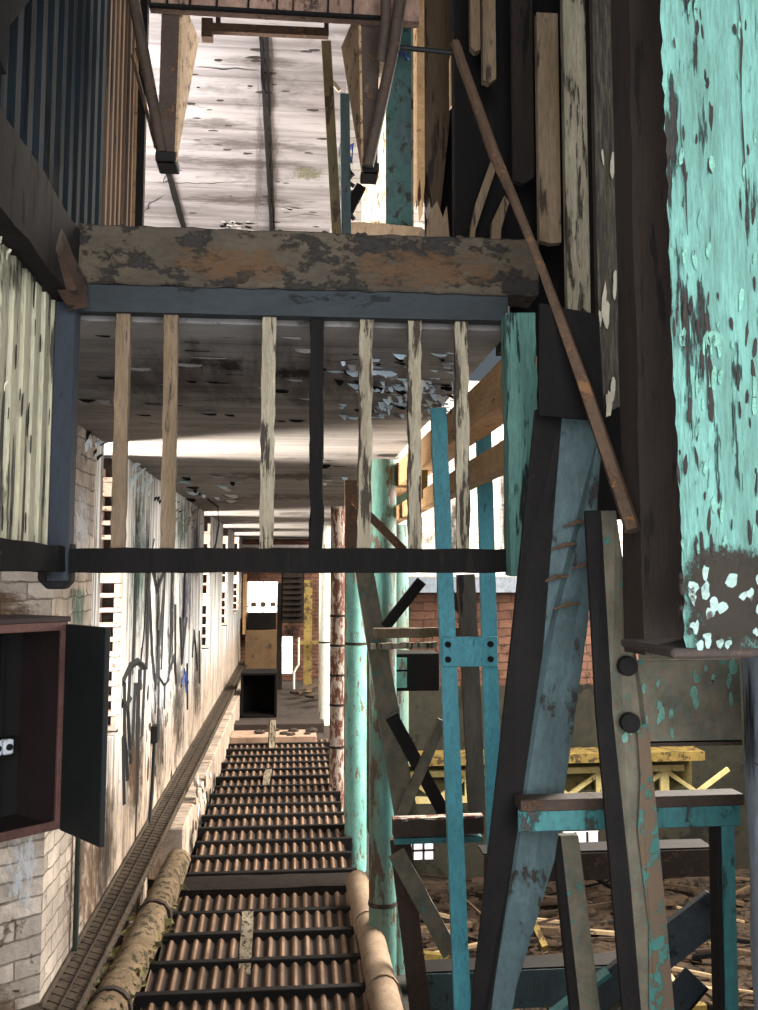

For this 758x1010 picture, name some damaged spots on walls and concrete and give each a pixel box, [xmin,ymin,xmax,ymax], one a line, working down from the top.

peeling [687,0,704,39]
peeling [679,125,698,182]
peeling [707,155,715,174]
peeling [682,242,711,270]
peeling [673,277,758,485]
peeling [679,488,758,710]
peeling [640,700,674,738]